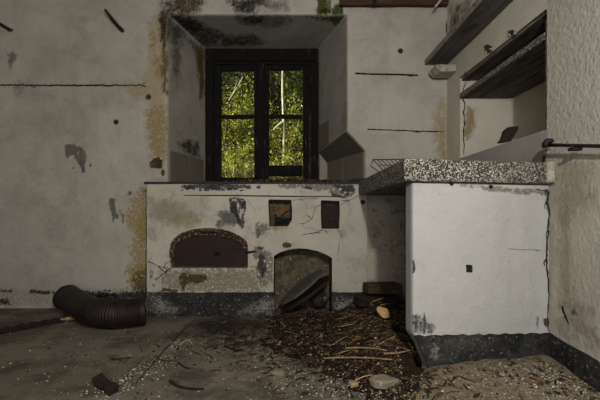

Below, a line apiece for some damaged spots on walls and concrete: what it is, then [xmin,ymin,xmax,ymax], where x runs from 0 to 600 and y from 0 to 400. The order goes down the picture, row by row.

leakage [159,0,266,47]
crack [0,81,146,89]
crack [462,72,470,153]
spalling [149,156,165,176]
spalling [85,184,273,302]
crack [292,198,342,257]
crack [508,189,569,331]
leakage [412,315,432,335]